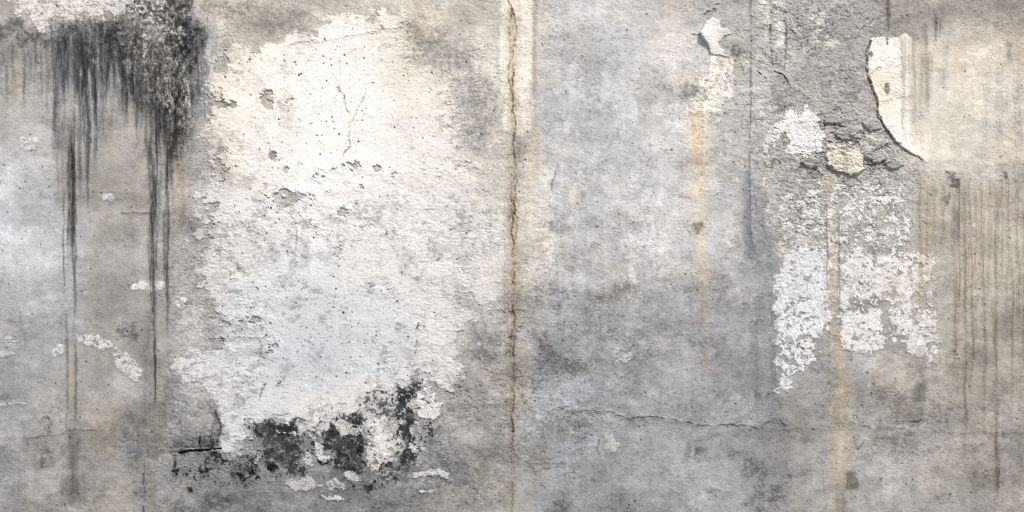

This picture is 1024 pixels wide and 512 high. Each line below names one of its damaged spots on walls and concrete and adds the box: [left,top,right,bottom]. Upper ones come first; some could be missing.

damp [0,0,447,512]
peeling [171,2,505,503]
crack [499,0,565,512]
crack [556,388,826,432]
spalling [699,0,949,391]